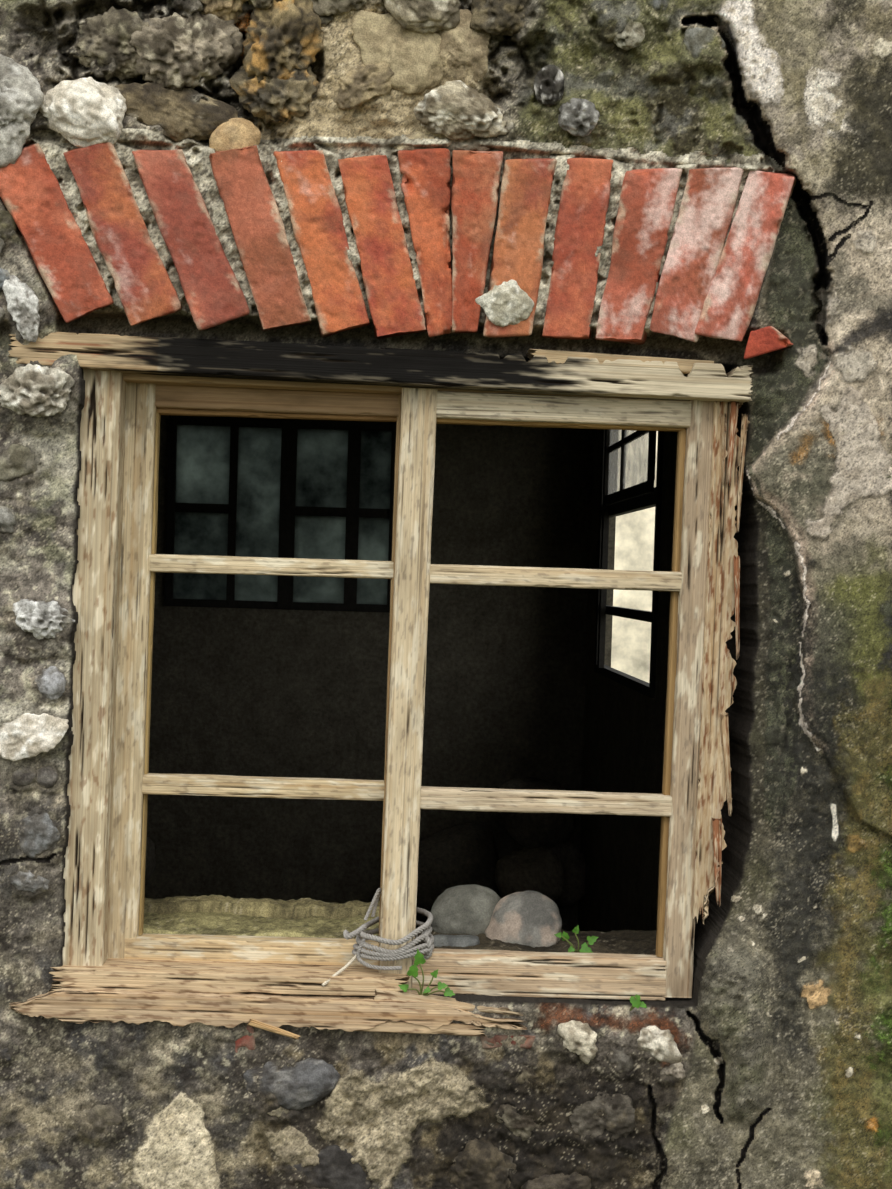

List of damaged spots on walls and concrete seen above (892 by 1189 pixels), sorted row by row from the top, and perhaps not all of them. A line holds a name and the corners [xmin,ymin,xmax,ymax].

crack [681,15,873,346]
flaking render [747,196,892,834]
crack [648,1085,667,1189]
crack [686,1011,771,1189]